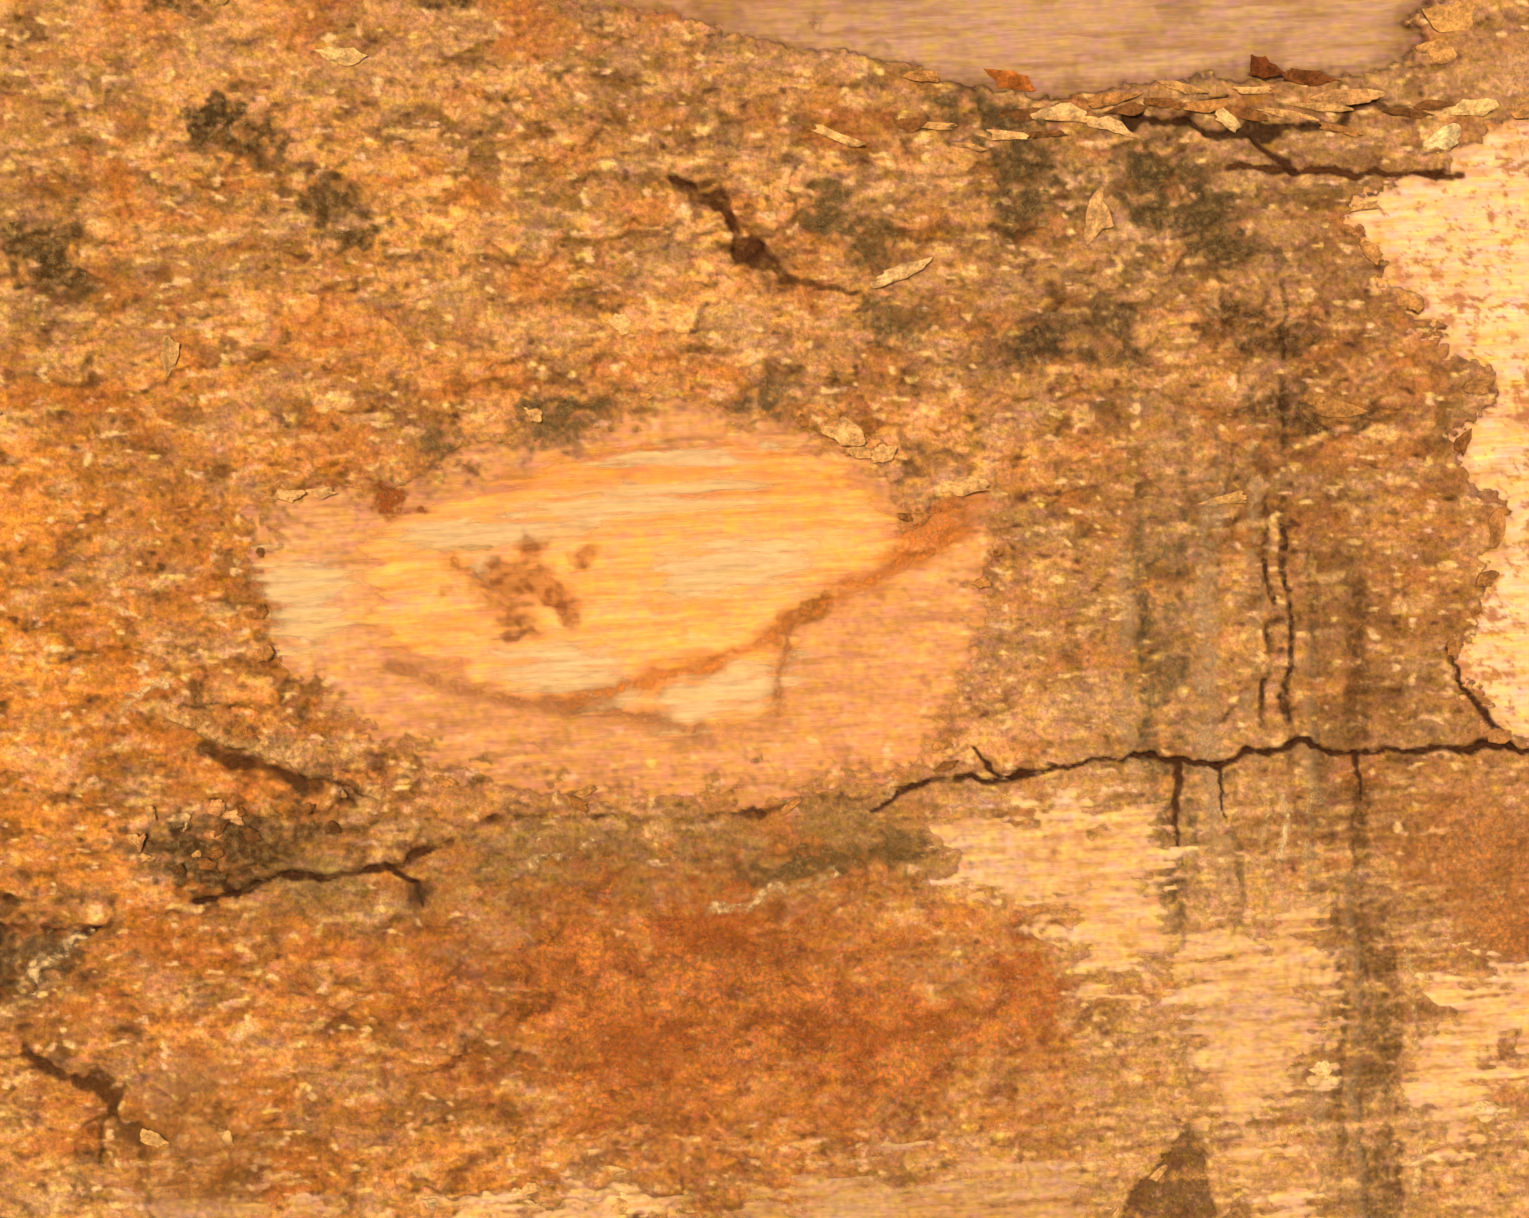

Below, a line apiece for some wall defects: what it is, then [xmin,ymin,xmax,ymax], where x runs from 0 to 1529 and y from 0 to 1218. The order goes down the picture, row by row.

peeling [606,313,633,335]
peeling [624,0,1529,750]
damp [1200,289,1319,358]
damp [1235,382,1385,448]
peeling [126,799,262,875]
crack [191,844,435,906]
spalling [161,391,1008,815]
crack [743,806,768,819]
damp [1118,471,1226,841]
crack [870,647,1529,865]
damp [1245,484,1324,739]
corrosion [380,852,1075,1173]